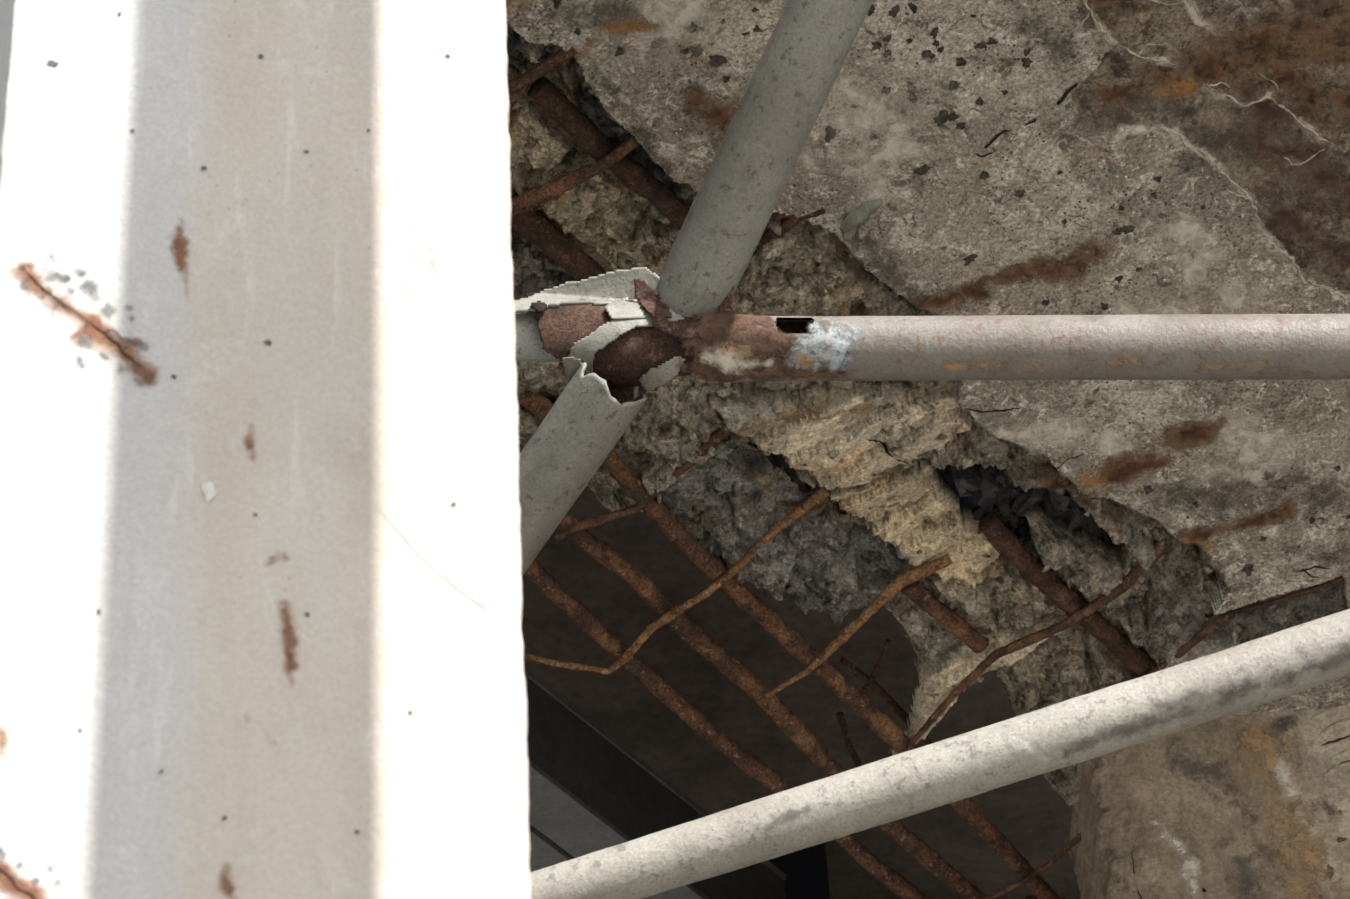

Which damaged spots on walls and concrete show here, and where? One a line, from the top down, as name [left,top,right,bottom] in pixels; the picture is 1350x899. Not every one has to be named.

crack [1066,0,1178,67]
crack [1151,0,1243,33]
spalling [506,24,697,276]
crack [1206,73,1331,166]
corrosion [172,227,188,271]
spalling [510,226,576,312]
corrosion [907,243,1114,312]
spalling [516,297,684,452]
spalling [587,356,1349,744]
corrosion [1175,498,1298,550]
corrosion [282,602,298,674]
crack [1321,735,1350,765]